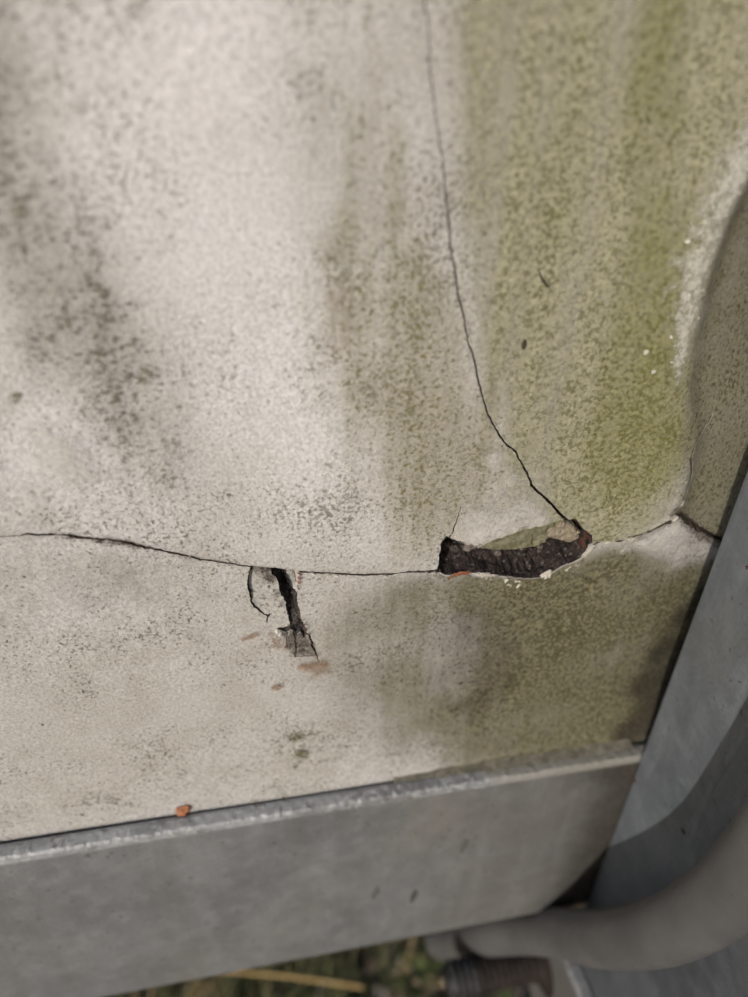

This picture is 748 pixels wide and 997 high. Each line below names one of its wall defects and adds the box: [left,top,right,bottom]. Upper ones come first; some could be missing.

crack [424,0,568,521]
leakage [585,0,690,505]
crack [0,532,251,568]
spalling [247,567,319,662]
crack [298,566,441,578]
leakage [463,502,546,545]
spalling [426,518,593,588]
leakage [638,522,688,565]
leakage [674,586,705,624]
leakage [617,634,687,740]